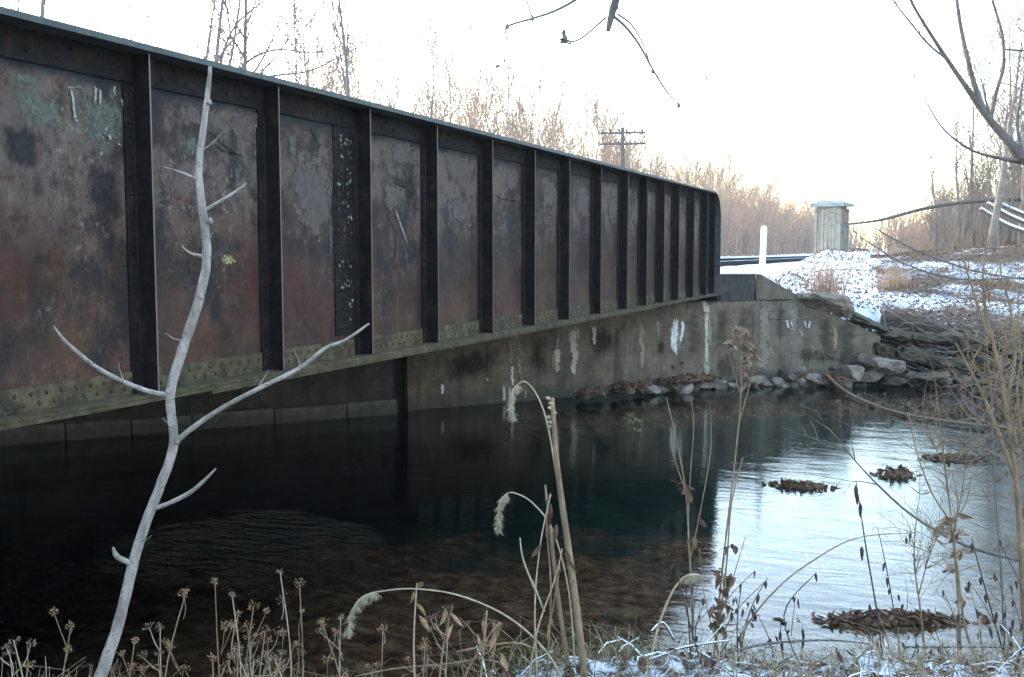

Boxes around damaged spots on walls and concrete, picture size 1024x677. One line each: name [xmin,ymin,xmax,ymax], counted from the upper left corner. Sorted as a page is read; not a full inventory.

corrosion [9,132,37,166]
water stain [440,350,494,394]
water stain [568,326,621,376]
efflorescence [638,319,685,372]
water stain [701,301,733,376]